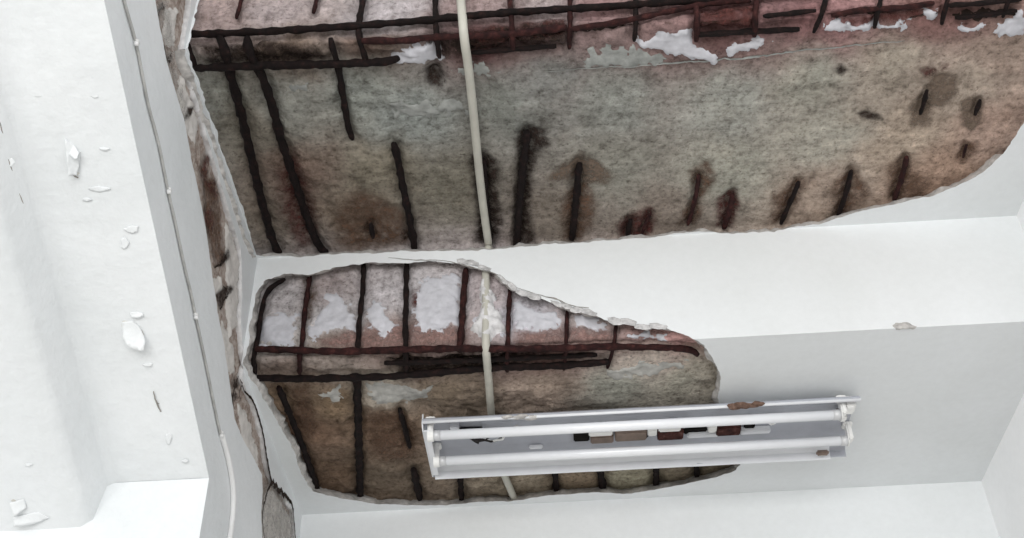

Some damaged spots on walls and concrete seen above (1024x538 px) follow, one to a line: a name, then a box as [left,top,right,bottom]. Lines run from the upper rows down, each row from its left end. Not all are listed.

rust [200,40,324,63]
rust [427,20,567,85]
spalling [188,0,1024,257]
rust [859,110,880,119]
rust [201,155,230,265]
rust [470,125,549,244]
rust [618,208,653,236]
rust [888,154,929,199]
rust [216,286,233,309]
flaking render [155,0,295,538]
rust [323,325,613,372]
spalling [243,258,740,505]